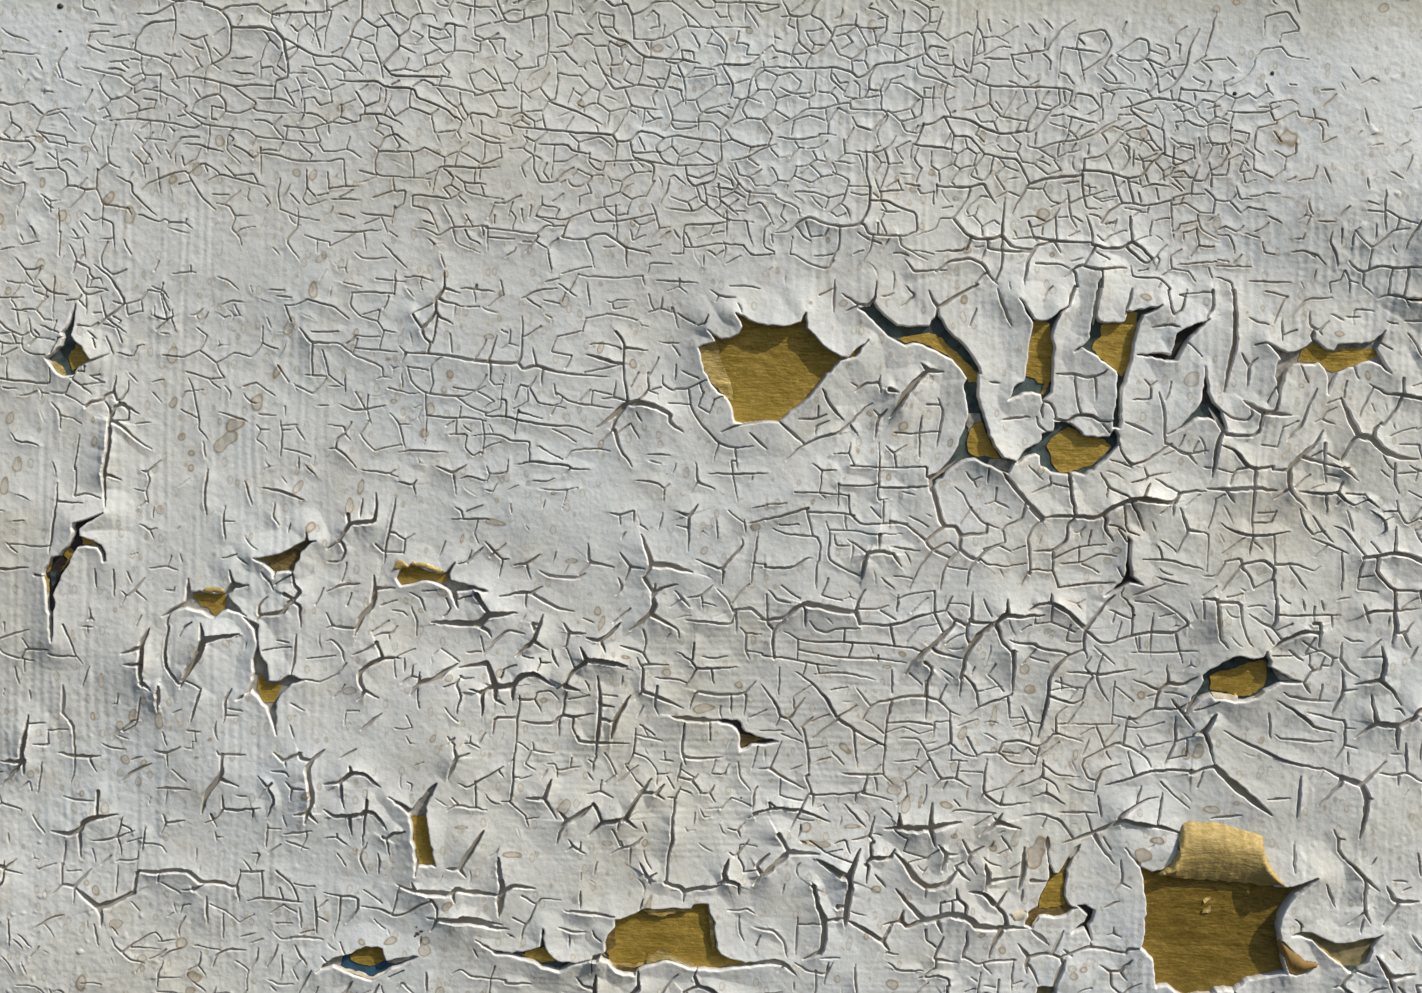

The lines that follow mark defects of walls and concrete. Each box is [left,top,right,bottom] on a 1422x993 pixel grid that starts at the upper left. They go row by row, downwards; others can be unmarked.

peeling [688,270,1239,504]
peeling [1255,281,1422,412]
peeling [32,499,119,655]
peeling [152,518,331,747]
peeling [385,551,502,620]
crack [278,365,1422,993]
peeling [1173,639,1315,726]
crack [0,553,550,993]
peeling [304,935,428,993]
peeling [464,893,795,988]
peeling [1011,839,1106,947]
peeling [1114,821,1395,993]